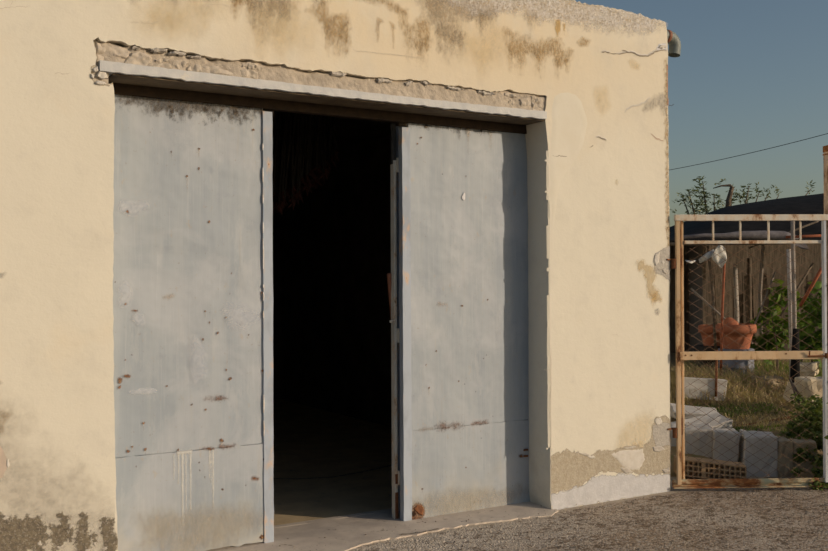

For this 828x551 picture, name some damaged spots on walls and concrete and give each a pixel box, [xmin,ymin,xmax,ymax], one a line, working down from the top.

crack [601,49,667,57]
spalling [90,39,546,111]
spalling [653,246,670,281]
peeling [551,416,671,510]
rust [412,503,425,520]
peeling [0,512,118,551]